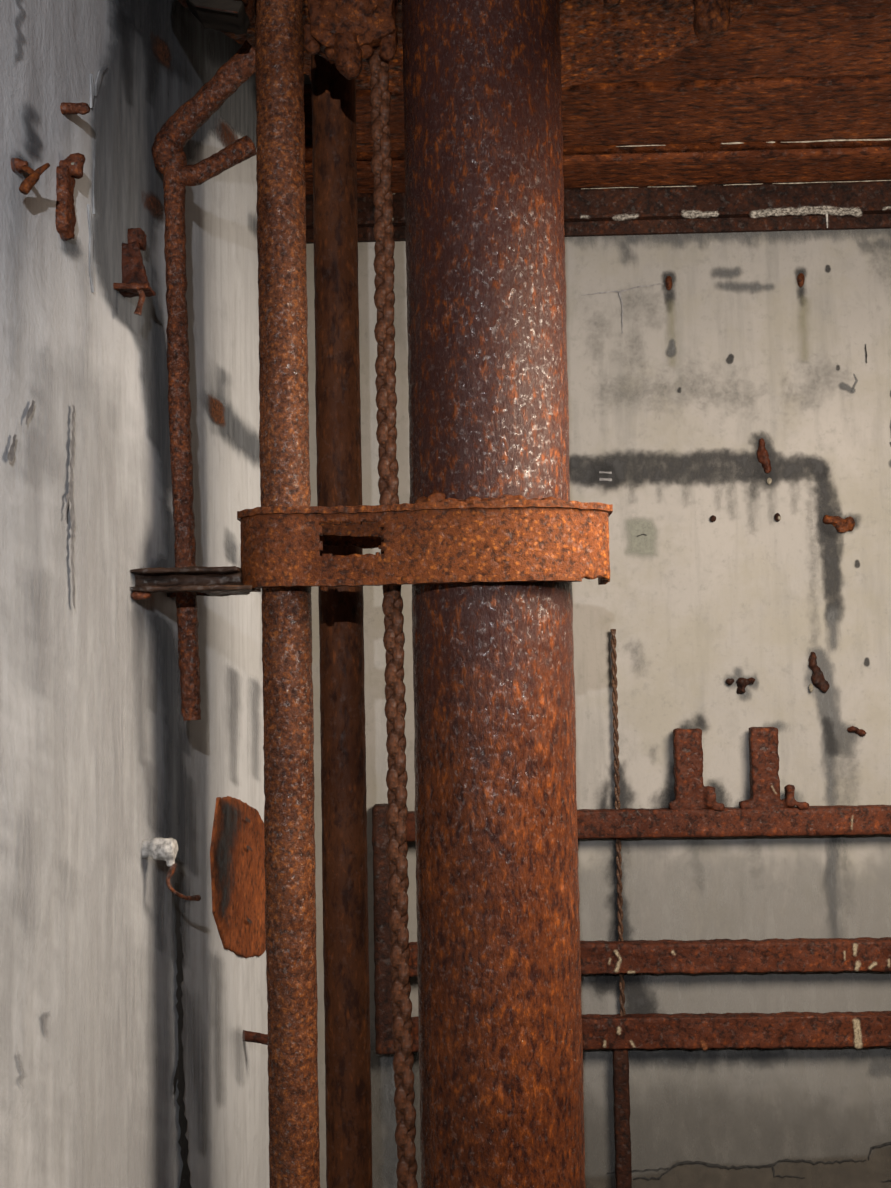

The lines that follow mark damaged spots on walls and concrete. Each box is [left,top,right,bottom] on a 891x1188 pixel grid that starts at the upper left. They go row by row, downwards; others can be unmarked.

rust [663,273,675,311]
rust [796,269,806,304]
damp [569,434,857,809]